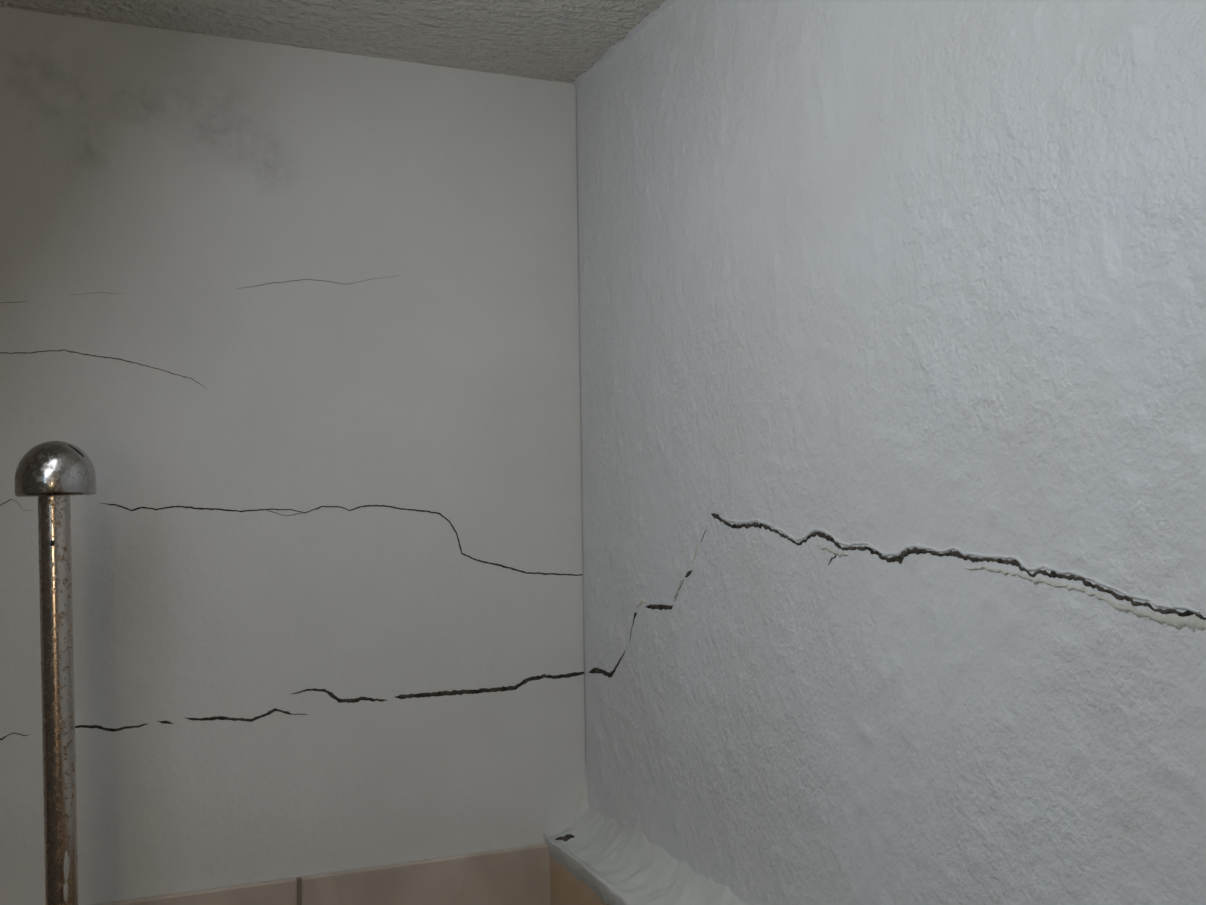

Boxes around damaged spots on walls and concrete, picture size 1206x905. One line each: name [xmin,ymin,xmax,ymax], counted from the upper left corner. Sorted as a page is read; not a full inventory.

crack [0,349,205,388]
crack [75,503,1206,732]